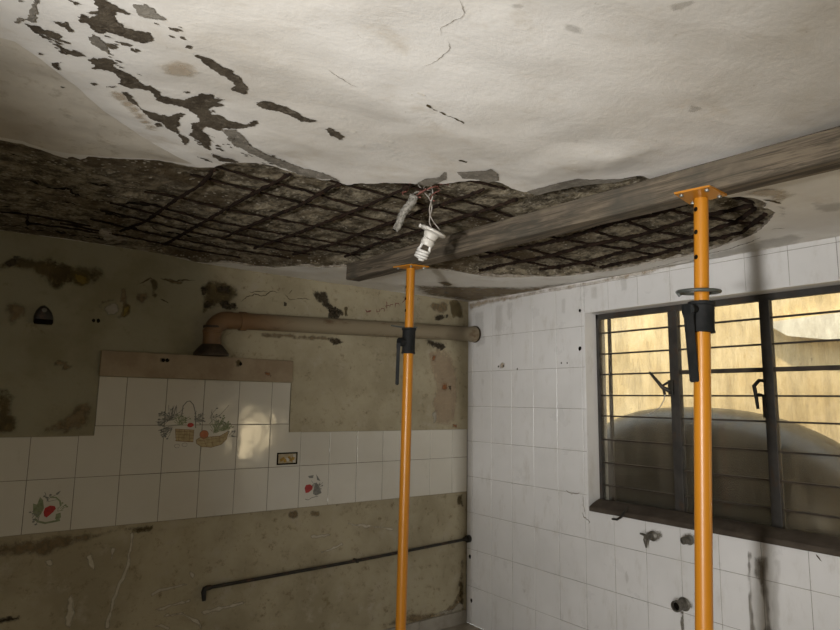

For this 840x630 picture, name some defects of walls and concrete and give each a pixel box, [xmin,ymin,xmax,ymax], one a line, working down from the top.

spalling [0,0,649,267]
spalling [428,204,694,277]
spalling [709,197,773,247]
peeling [201,281,237,312]
leakage [748,554,766,596]